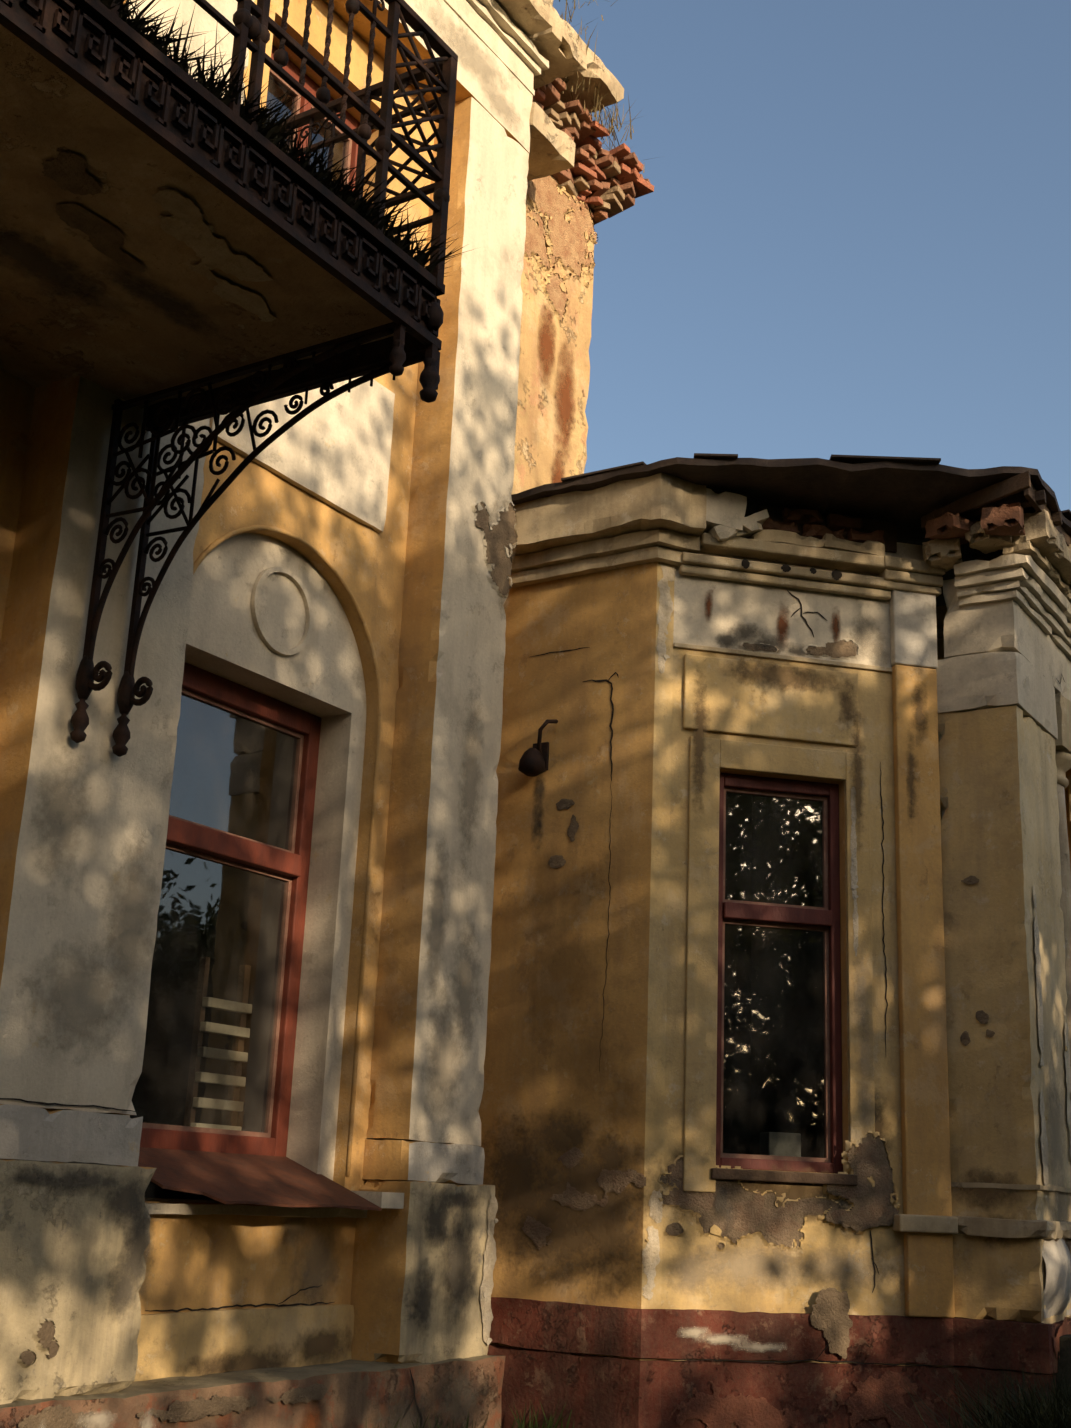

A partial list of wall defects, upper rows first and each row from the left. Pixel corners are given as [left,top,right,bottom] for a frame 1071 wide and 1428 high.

spalling [523,175,599,324]
peeling [471,495,518,599]
spalling [801,638,861,661]
spalling [548,798,579,868]
crack [531,647,619,1072]
crack [145,1285,334,1312]
leakage [416,1190,477,1327]
leakage [490,1116,651,1281]
spalling [642,1131,900,1300]
peeling [810,1287,853,1359]